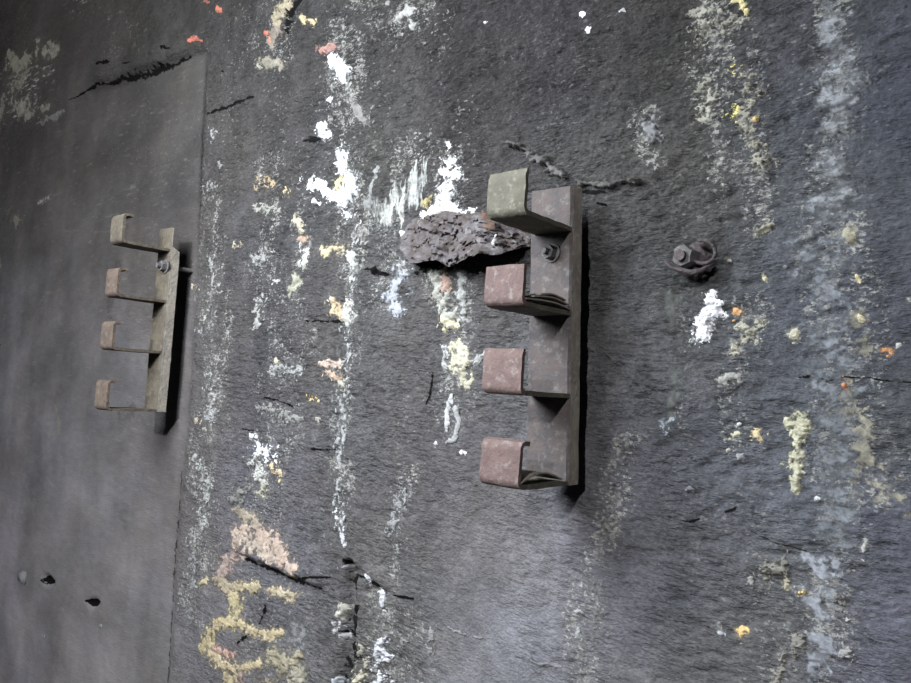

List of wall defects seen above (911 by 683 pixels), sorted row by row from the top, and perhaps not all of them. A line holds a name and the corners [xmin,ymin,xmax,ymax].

leakage [394,3,419,30]
crack [69,45,192,100]
leakage [314,121,332,139]
crack [582,189,607,206]
leakage [248,141,485,548]
leakage [680,289,767,356]
leakage [746,48,907,622]
leakage [716,371,742,388]
crack [237,605,267,644]
crack [244,558,414,683]
leakage [331,602,415,683]
leakage [767,624,854,683]